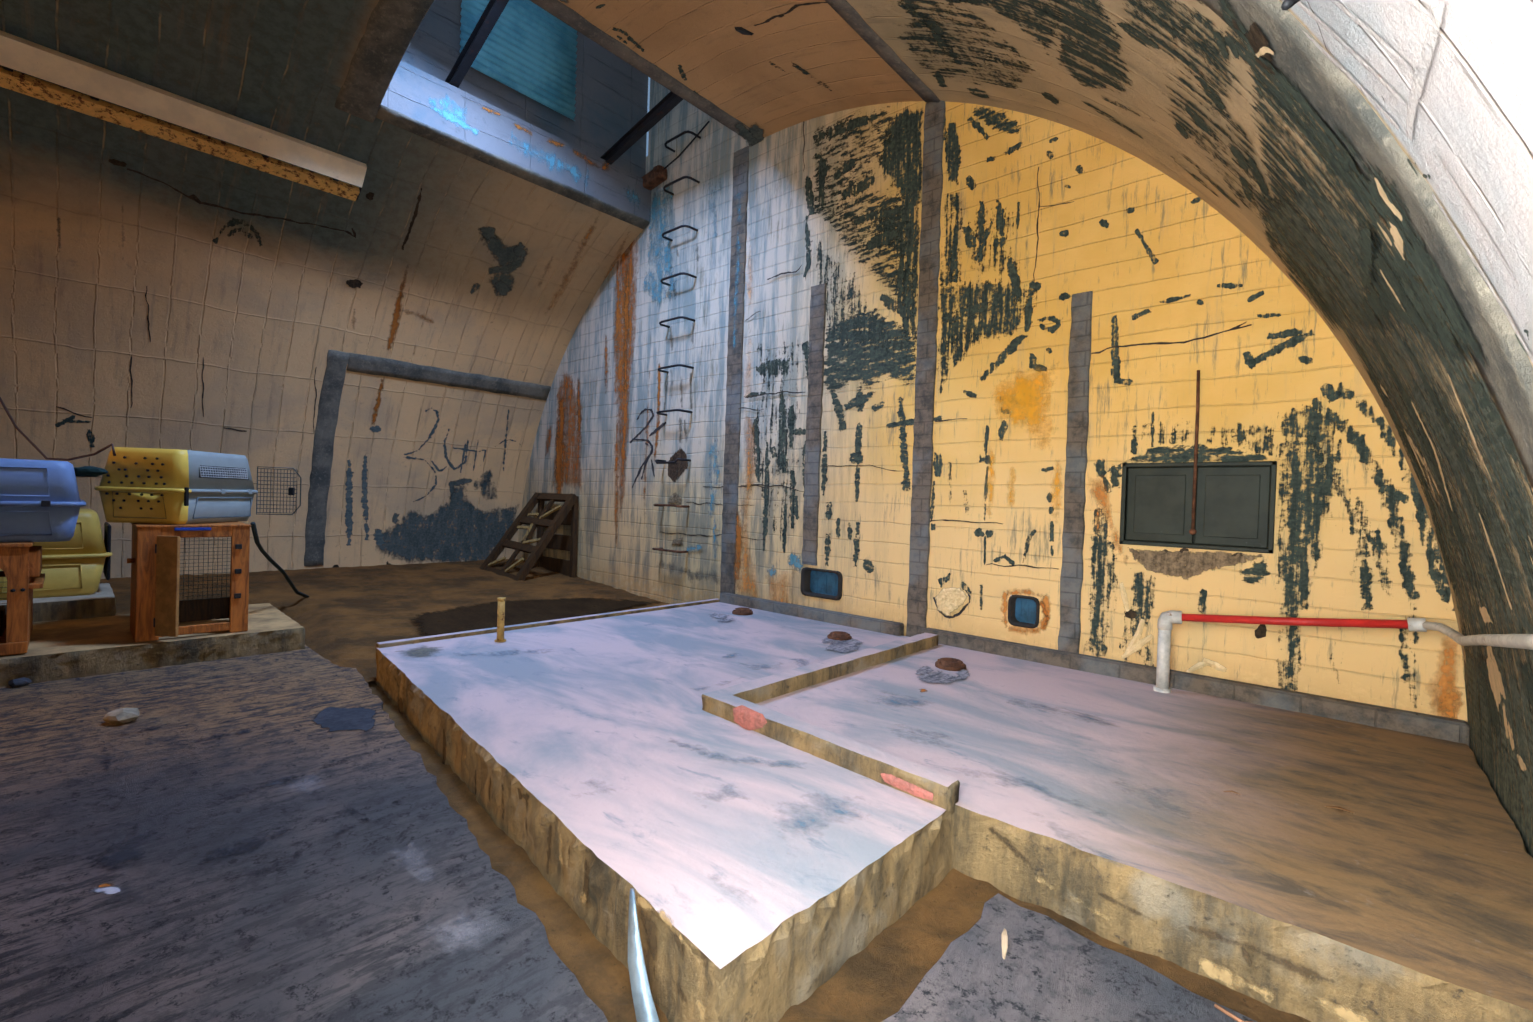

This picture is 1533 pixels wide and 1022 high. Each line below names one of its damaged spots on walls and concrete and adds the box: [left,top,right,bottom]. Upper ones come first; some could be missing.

corrosion [388,274,433,349]
corrosion [545,376,581,494]
corrosion [605,241,636,541]
corrosion [644,364,661,497]
peeling [746,106,923,573]
peeling [898,0,1533,861]
water stain [345,454,517,562]
corrosion [1001,590,1050,633]
water stain [312,707,376,732]
spalling [733,705,767,731]
spalling [881,773,934,801]
spalling [1188,926,1334,983]